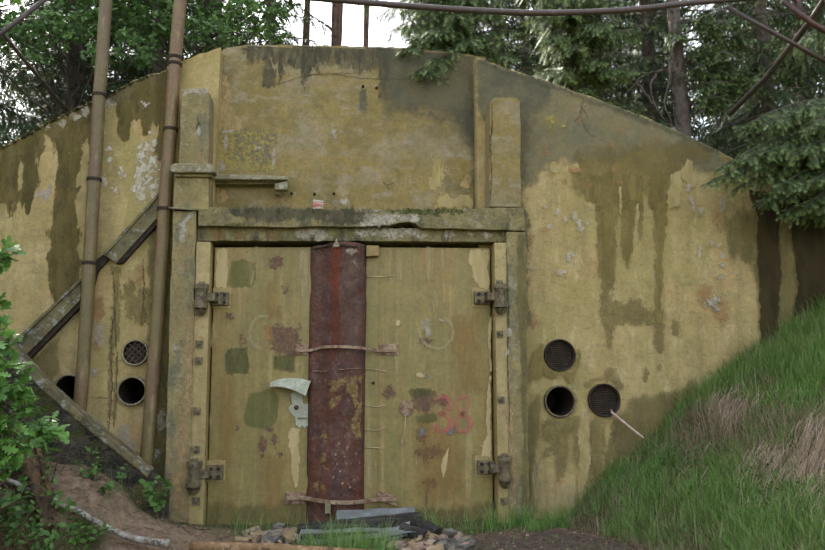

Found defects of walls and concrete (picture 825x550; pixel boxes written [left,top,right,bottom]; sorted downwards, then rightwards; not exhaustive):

water stain [262,46,321,89]
water stain [0,104,92,302]
peeling [74,138,90,228]
peeling [101,131,160,203]
spalling [295,228,328,241]
spalling [354,157,473,241]
peeling [465,231,493,289]
water stain [575,143,709,353]
water stain [725,190,825,346]
peeling [288,427,300,488]
water stain [517,265,581,517]
water stain [589,383,694,484]